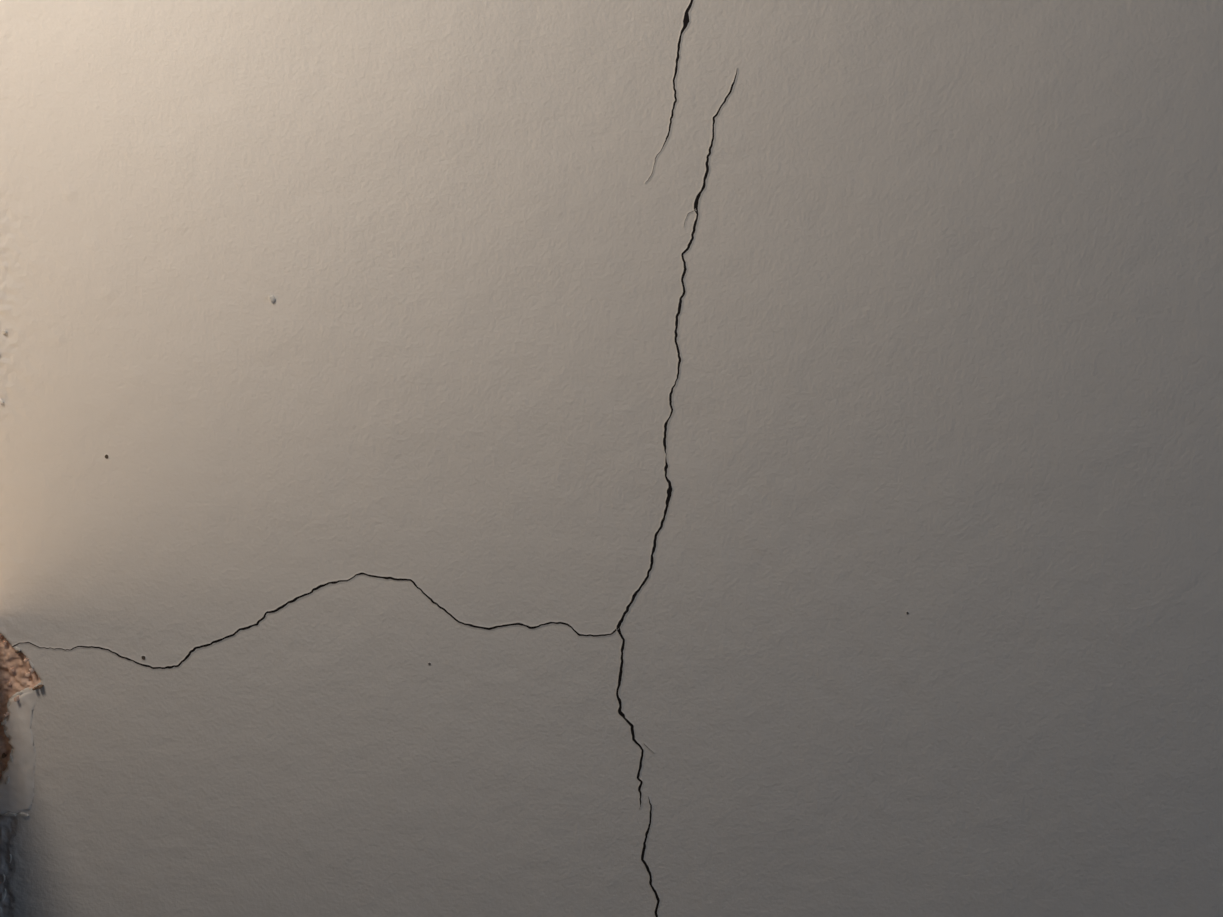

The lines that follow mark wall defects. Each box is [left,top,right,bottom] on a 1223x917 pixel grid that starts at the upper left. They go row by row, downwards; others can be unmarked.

crack [644,0,695,185]
crack [12,68,739,917]
flaking render [0,633,44,779]
flaking render [0,812,29,917]